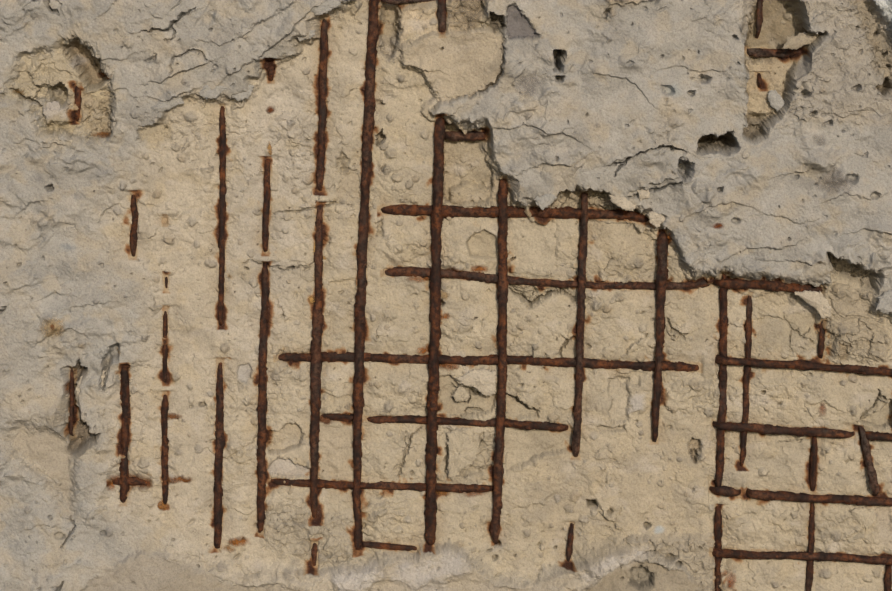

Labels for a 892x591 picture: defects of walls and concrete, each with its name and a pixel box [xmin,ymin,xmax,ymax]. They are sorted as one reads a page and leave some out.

spalling [4,38,115,140]
spalling [743,0,822,128]
spalling [851,0,892,94]
spalling [101,0,738,586]
spalling [727,256,892,369]
spalling [697,285,892,591]
spalling [582,561,703,591]